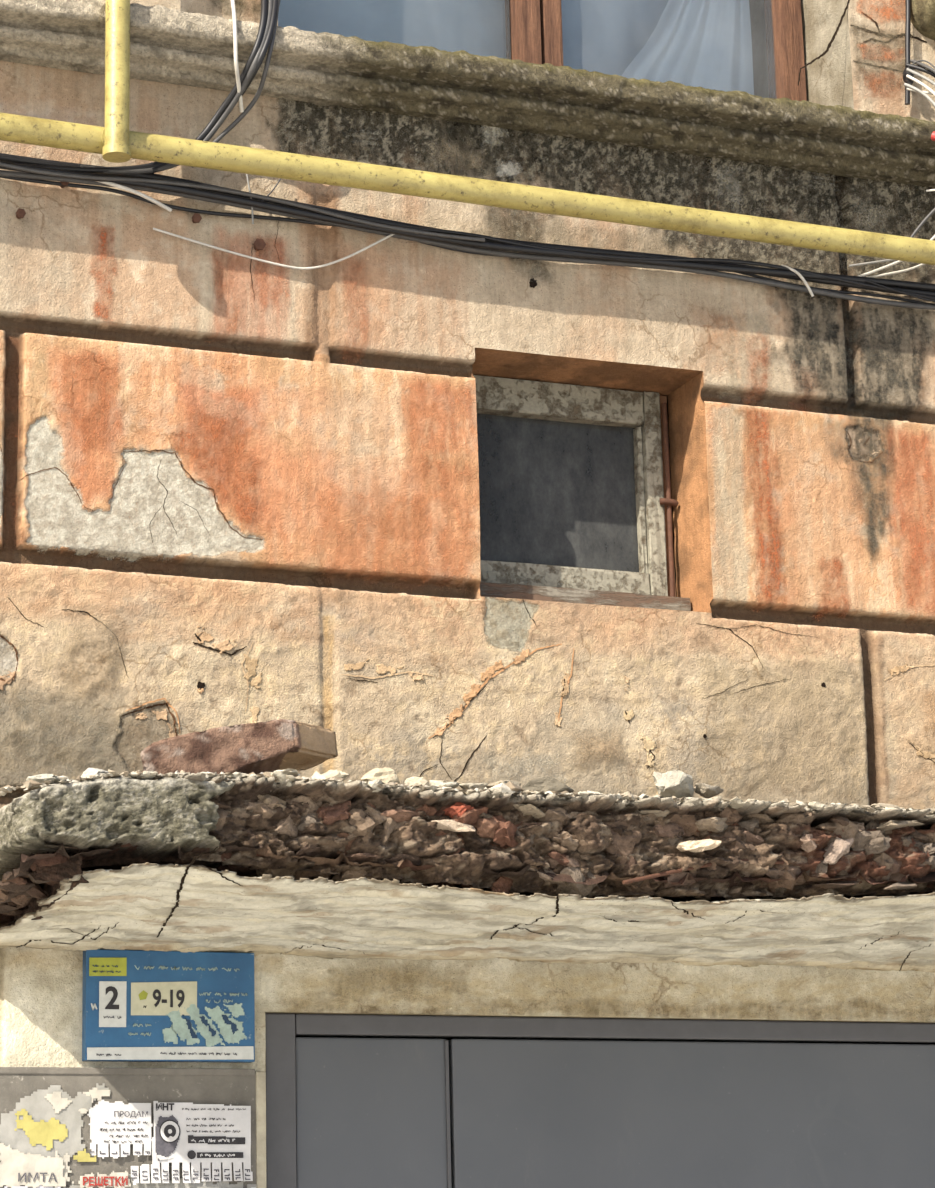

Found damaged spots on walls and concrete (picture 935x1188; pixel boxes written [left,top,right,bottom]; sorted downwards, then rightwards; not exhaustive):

crack [798,0,927,86]
damp [268,98,935,242]
damp [663,229,935,554]
peeling [0,417,264,562]
rust [747,411,780,606]
flaking render [0,635,19,691]
flaking render [428,597,574,739]
crack [697,623,818,699]
crack [420,736,486,782]
spalling [114,626,935,901]
crack [157,847,242,937]
crack [491,892,559,939]